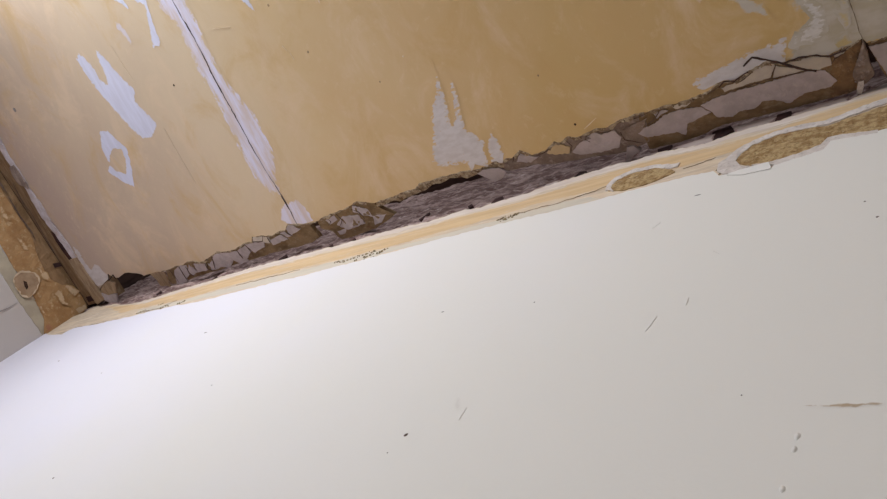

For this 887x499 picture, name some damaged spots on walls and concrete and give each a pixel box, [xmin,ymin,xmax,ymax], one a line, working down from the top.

crack [172,0,297,224]
flaking render [0,0,887,335]